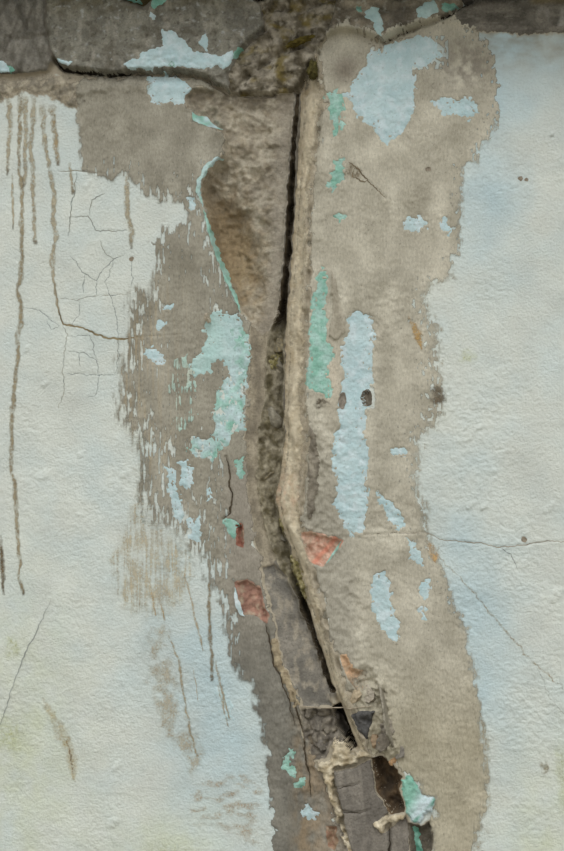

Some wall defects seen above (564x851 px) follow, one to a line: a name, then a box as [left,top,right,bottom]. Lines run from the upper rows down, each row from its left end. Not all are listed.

crack [55,59,131,78]
leakage [6,98,60,594]
crack [24,170,161,408]
leakage [113,505,230,726]
leakage [155,642,199,767]
peeling [0,71,371,851]
crack [224,56,371,795]
peeling [124,0,501,851]
crack [369,532,564,567]